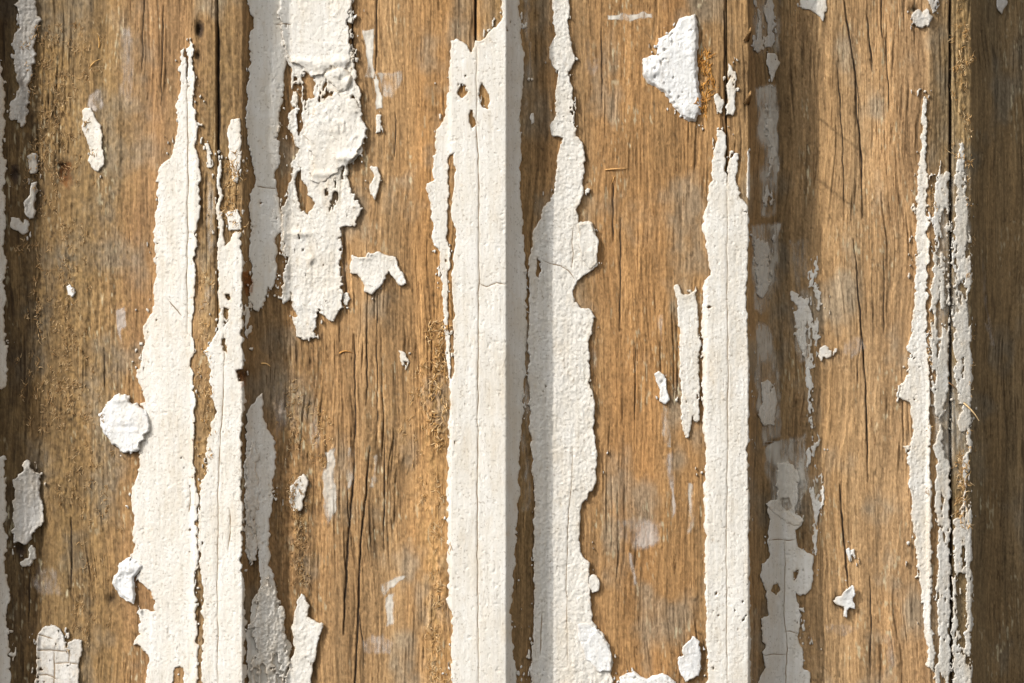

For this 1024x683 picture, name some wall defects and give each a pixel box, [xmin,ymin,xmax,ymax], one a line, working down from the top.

peeling [0,0,42,389]
peeling [98,0,406,683]
crack [344,304,385,683]
peeling [426,0,837,683]
crack [840,488,872,672]
crack [837,0,889,216]
peeling [896,89,978,683]